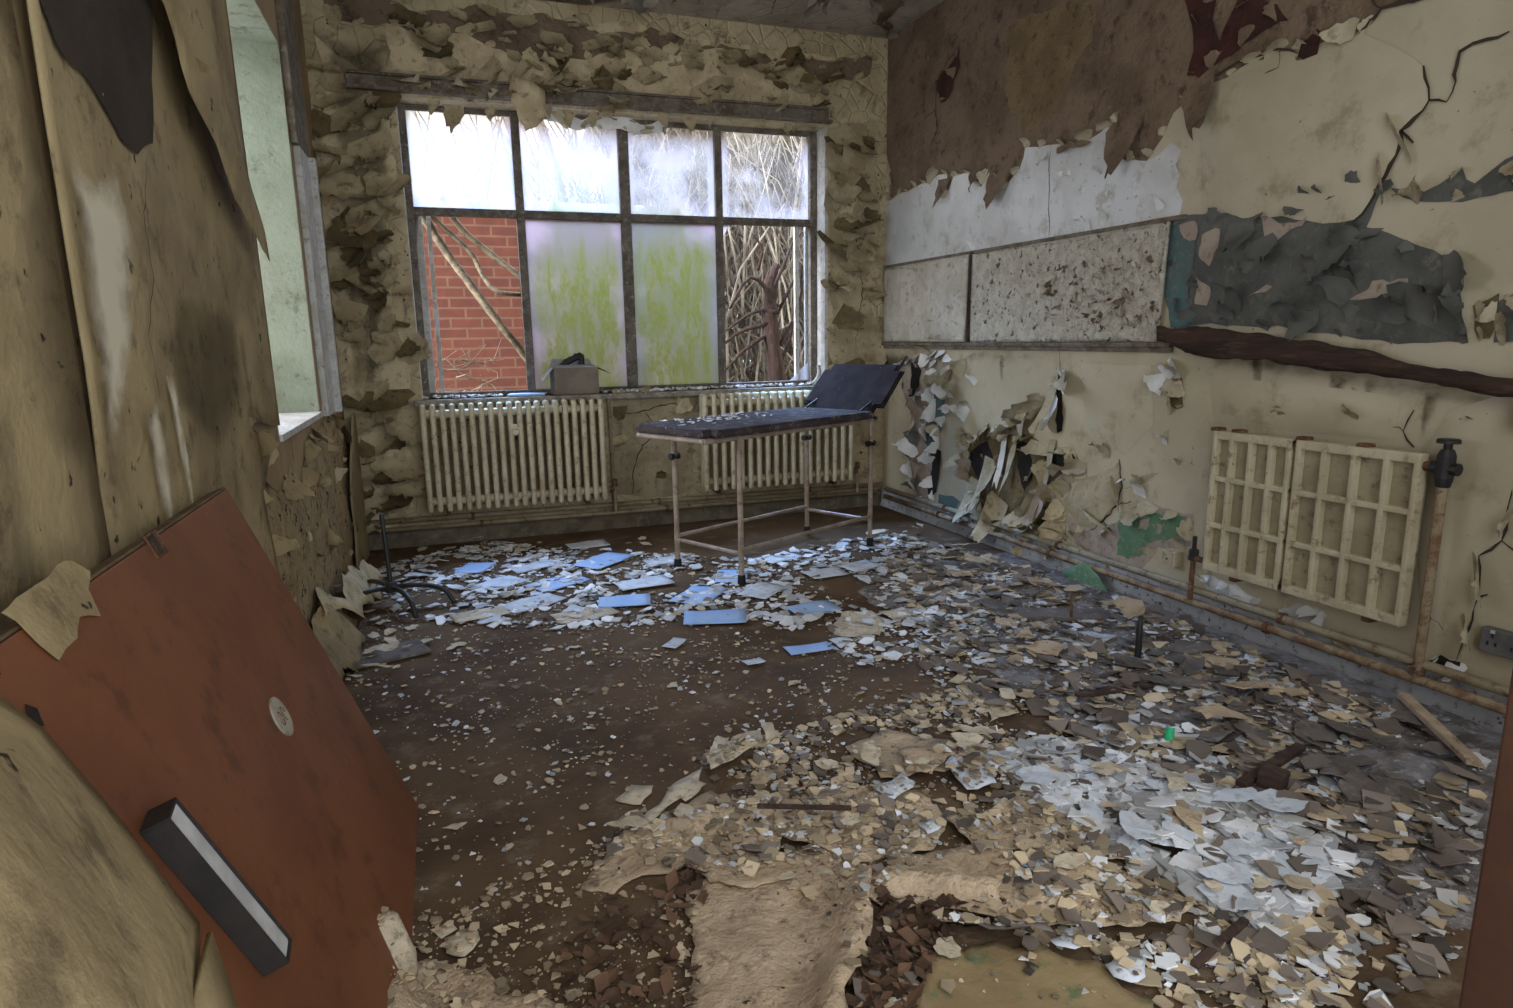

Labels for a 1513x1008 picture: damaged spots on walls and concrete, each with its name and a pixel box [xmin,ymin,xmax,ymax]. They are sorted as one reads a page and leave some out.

flaking render [246,0,1513,630]
crack [1353,31,1509,222]